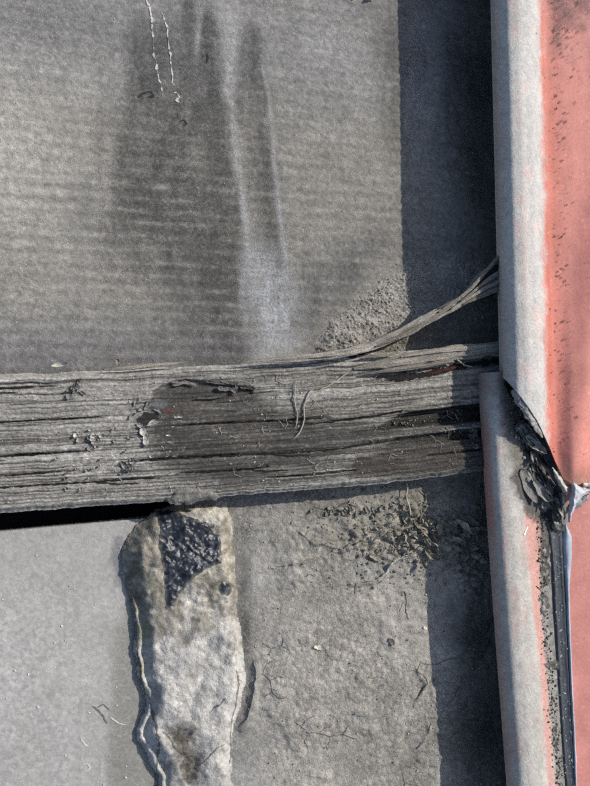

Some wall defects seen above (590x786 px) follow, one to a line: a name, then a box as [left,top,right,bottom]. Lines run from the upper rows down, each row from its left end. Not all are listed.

crack [297,502,384,552]
crack [263,642,288,699]
crack [416,657,458,701]
crack [296,716,356,750]